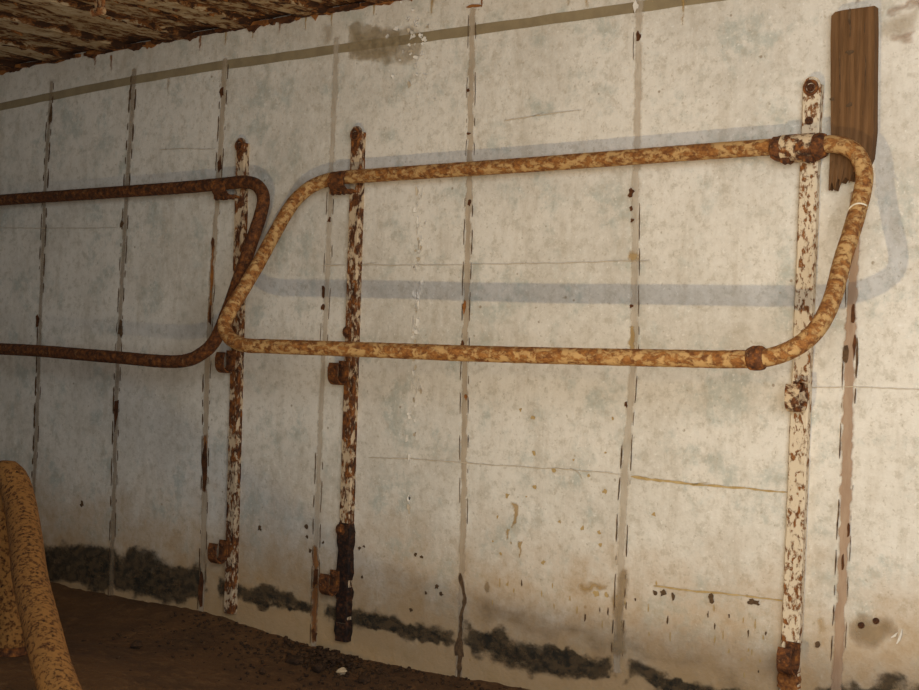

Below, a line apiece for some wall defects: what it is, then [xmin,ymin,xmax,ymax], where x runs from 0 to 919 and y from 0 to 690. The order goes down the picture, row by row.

corrosion [0,0,412,75]
damp [385,9,429,99]
damp [505,493,522,557]
mould [45,544,205,604]
damp [237,584,313,612]
damp [351,610,611,679]
damp [581,584,636,628]
damp [853,618,902,644]
mould [629,661,713,690]
damp [819,674,904,690]